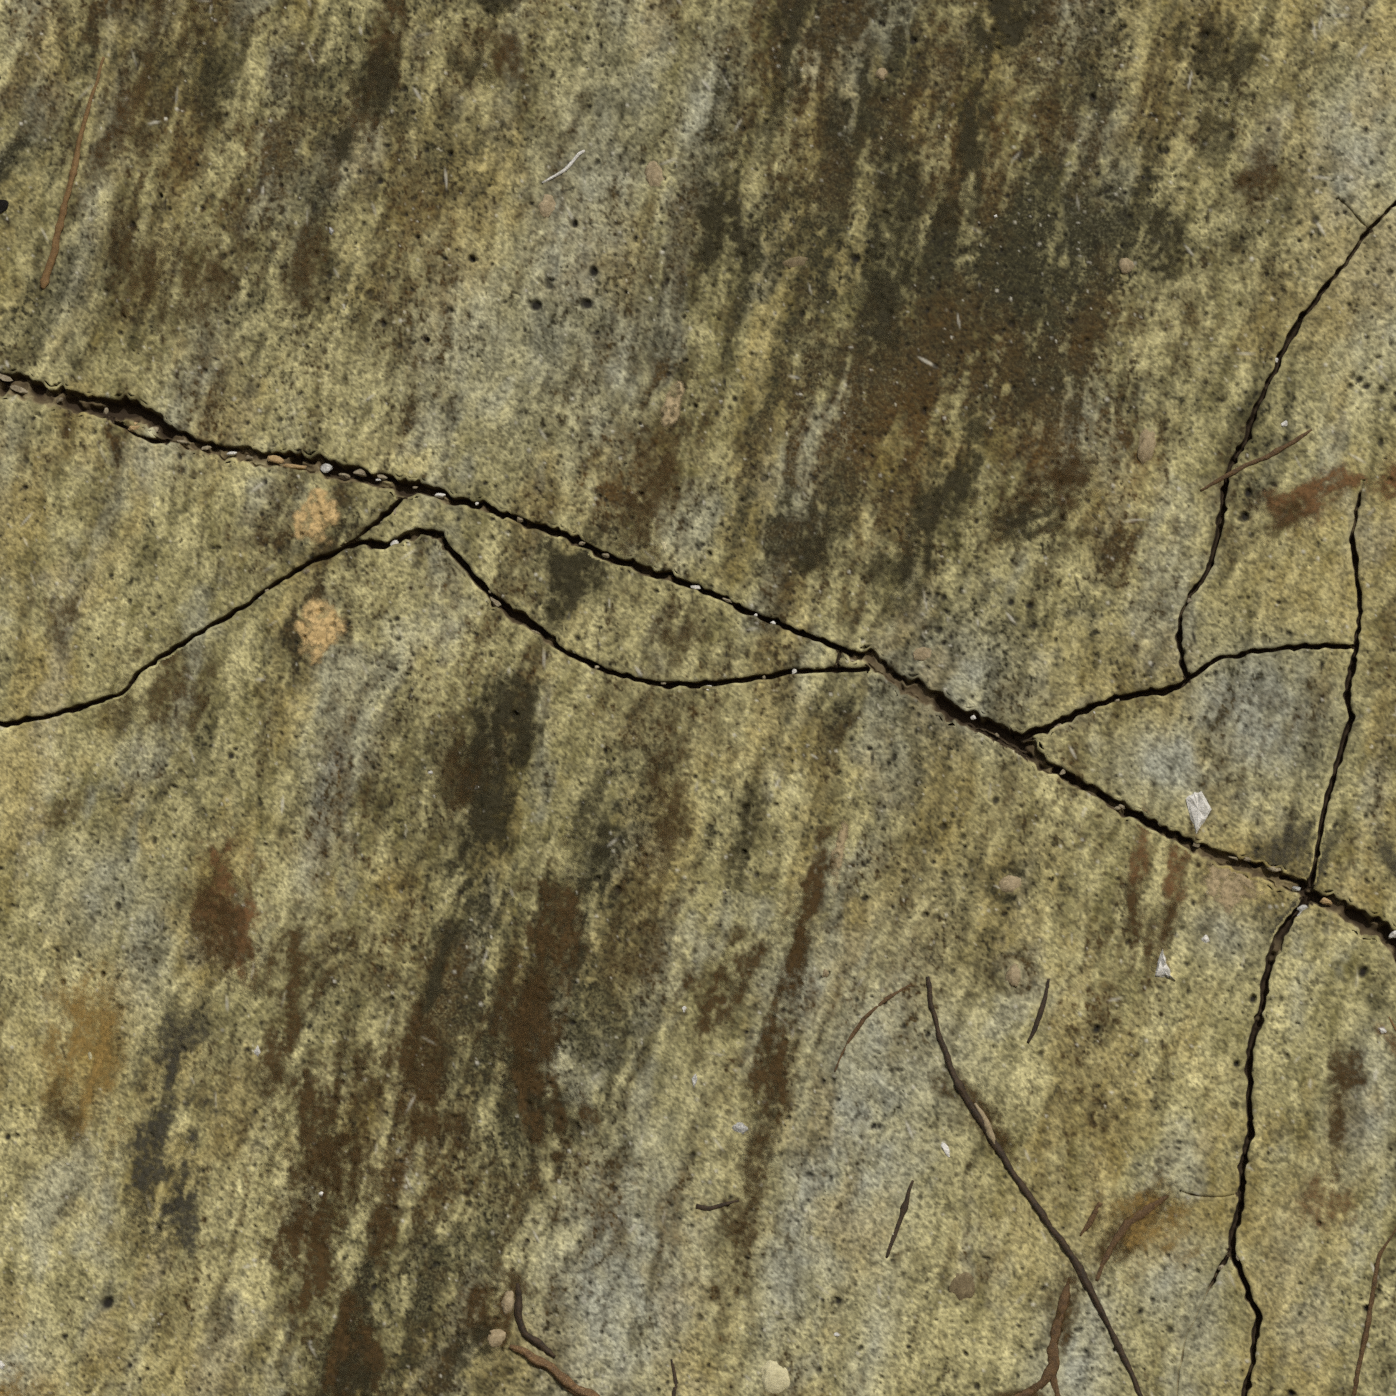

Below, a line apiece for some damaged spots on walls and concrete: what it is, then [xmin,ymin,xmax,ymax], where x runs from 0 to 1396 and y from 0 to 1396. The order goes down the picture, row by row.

leakage [695,172,755,277]
leakage [536,533,604,620]
crack [0,195,1396,968]
leakage [869,412,984,614]
leakage [995,455,1095,539]
corrosion [1265,465,1396,534]
leakage [444,673,545,865]
leakage [482,860,600,1143]
leakage [673,927,768,1037]
leakage [722,825,835,1259]
leakage [264,924,463,1396]
crack [1173,896,1312,1396]